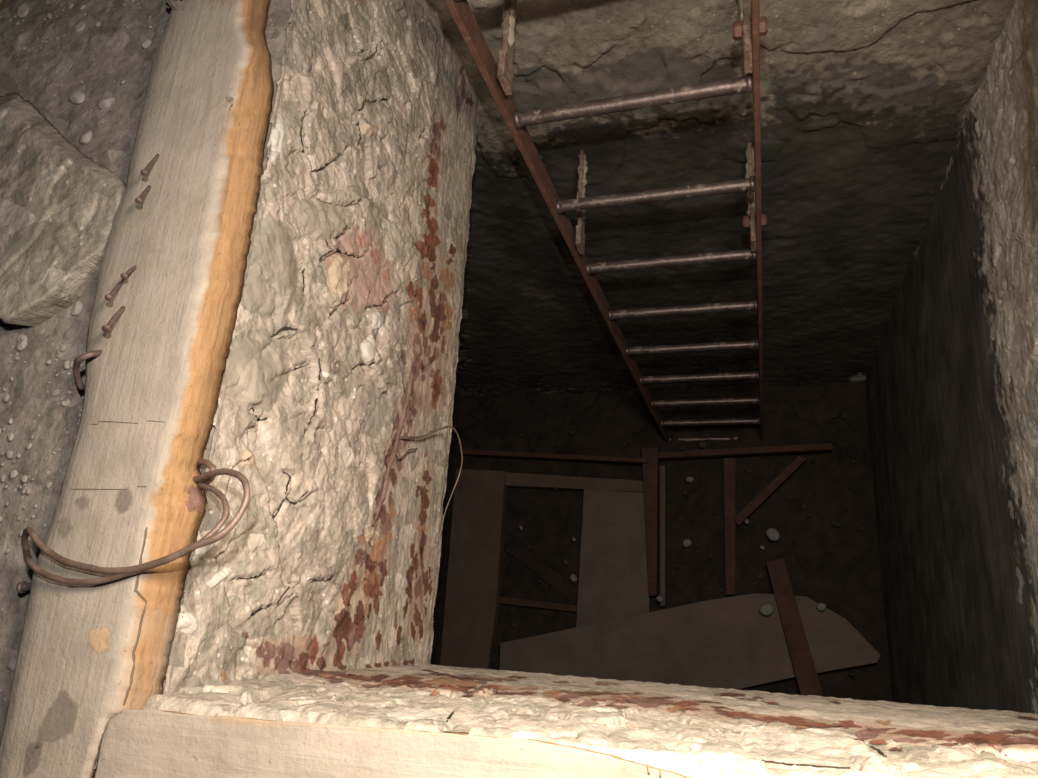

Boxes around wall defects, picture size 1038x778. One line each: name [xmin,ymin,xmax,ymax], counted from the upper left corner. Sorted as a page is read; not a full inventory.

crack [299,98,388,172]
crack [301,198,367,292]
crack [329,291,397,315]
crack [289,358,321,434]
rust [242,117,1038,756]